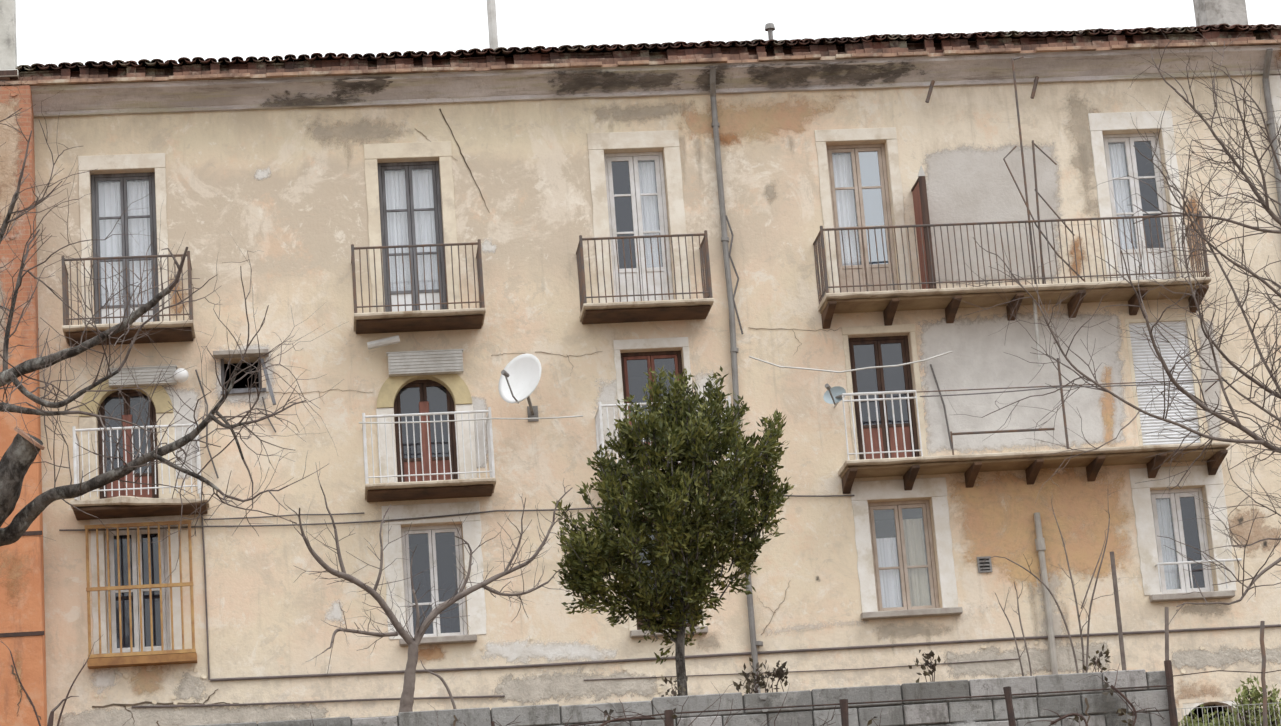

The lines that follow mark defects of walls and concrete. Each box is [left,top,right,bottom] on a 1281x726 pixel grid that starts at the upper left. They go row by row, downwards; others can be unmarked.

damp [262,76,393,107]
damp [308,120,399,143]
crack [415,108,490,213]
damp [550,61,925,144]